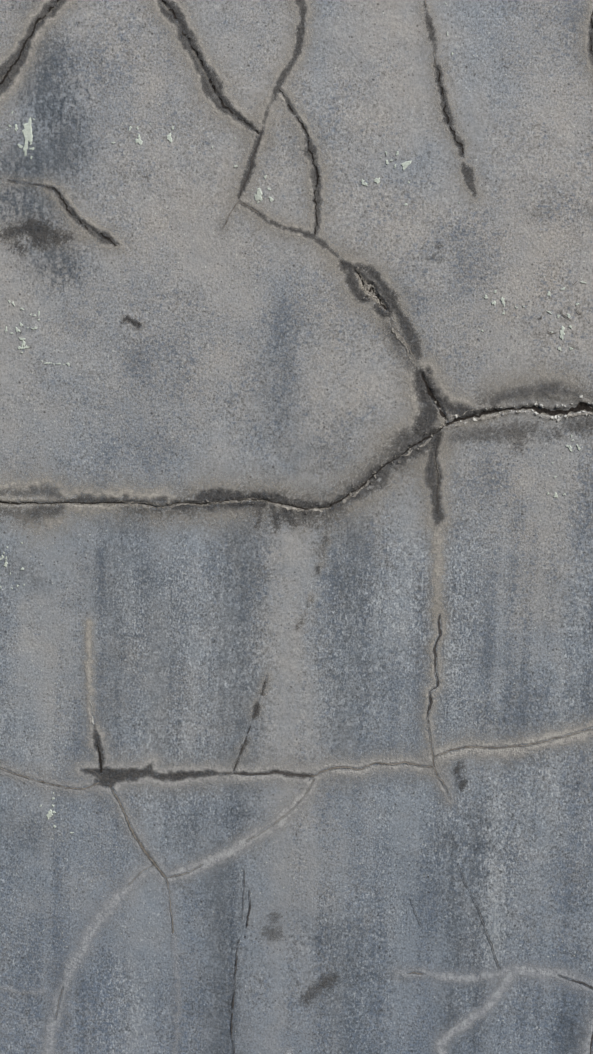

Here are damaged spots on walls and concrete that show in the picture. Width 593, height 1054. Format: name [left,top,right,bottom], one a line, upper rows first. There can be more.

crack [0,0,77,102]
crack [9,180,122,249]
crack [152,0,345,263]
crack [420,0,479,201]
crack [581,0,593,82]
crack [0,303,593,564]
water stain [420,424,449,615]
crack [0,609,593,1054]